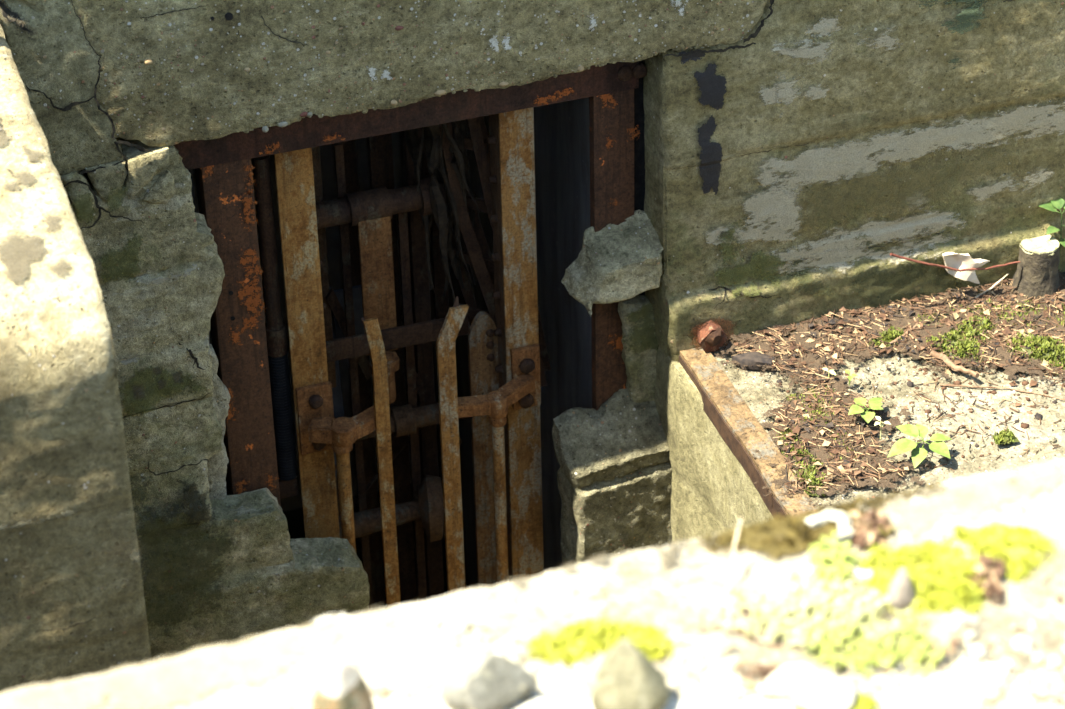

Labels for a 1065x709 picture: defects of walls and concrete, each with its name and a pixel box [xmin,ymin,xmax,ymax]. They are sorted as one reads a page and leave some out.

crack [663,0,775,58]
peeling [772,18,842,64]
peeling [857,29,898,50]
crack [25,0,153,229]
corrosion [534,87,574,106]
corrosion [239,165,258,231]
peeling [721,102,1065,274]
corrosion [227,248,266,346]